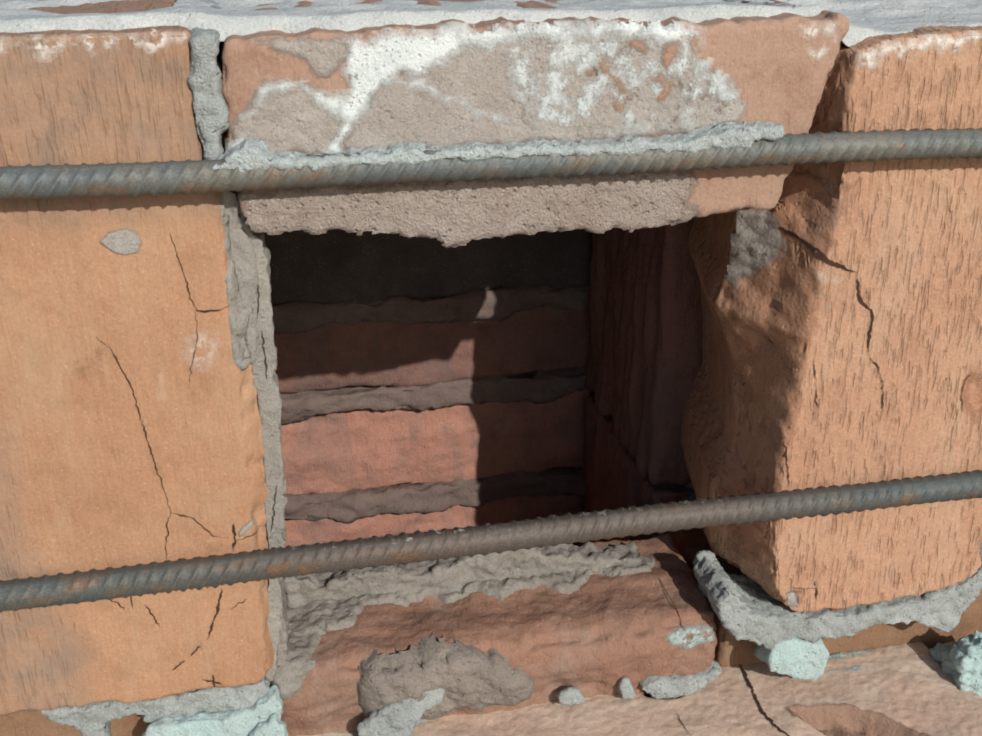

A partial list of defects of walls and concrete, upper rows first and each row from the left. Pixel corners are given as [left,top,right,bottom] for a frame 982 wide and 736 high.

water stain [260,19,737,153]
spalling [237,170,702,248]
crack [170,234,230,382]
crack [257,285,268,379]
crack [772,226,884,413]
crack [96,337,277,559]
crack [782,438,790,483]
crack [111,596,160,627]
crack [172,589,247,671]
spalling [786,591,799,607]
crack [740,664,790,736]